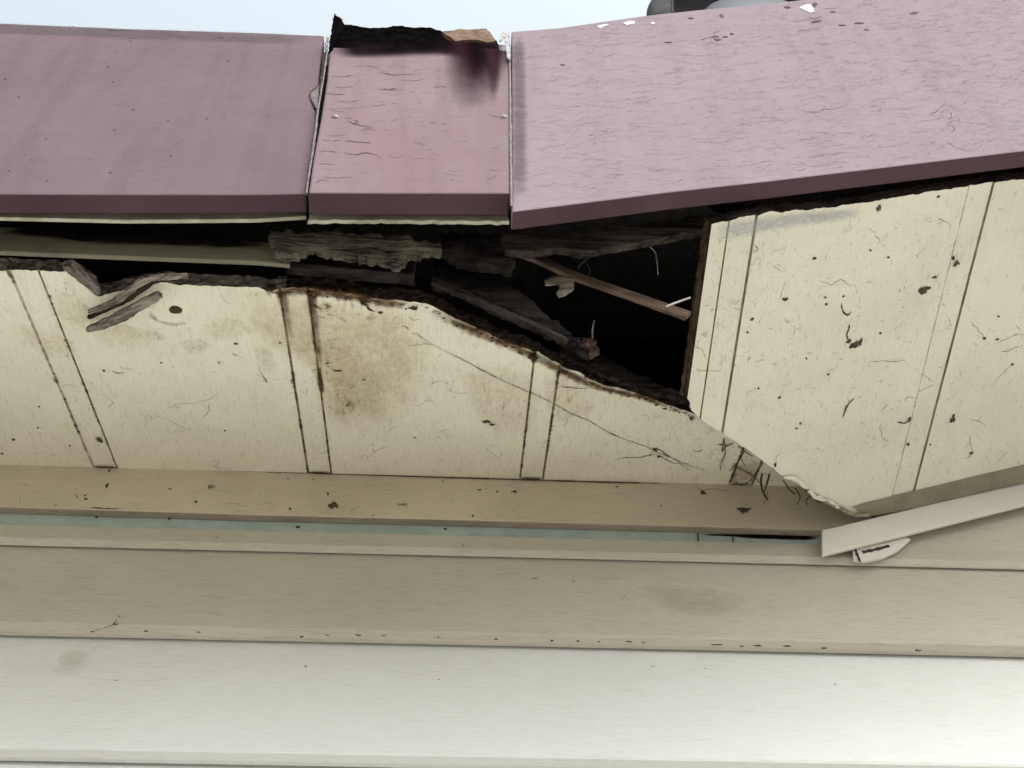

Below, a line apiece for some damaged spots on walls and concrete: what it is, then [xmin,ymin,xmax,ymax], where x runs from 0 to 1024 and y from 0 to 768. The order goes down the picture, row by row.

damp [267,288,695,420]
crack [3,193,1024,506]
peeling [783,476,870,517]